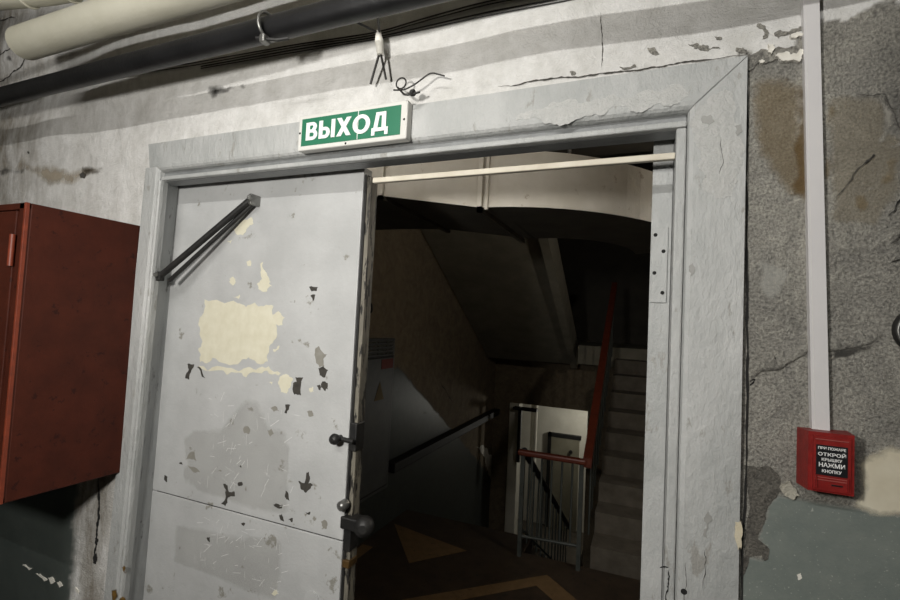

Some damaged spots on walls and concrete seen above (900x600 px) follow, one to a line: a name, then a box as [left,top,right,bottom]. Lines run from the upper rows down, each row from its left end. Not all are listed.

peeling [688,36,722,51]
peeling [736,23,803,71]
crack [859,93,900,128]
water stain [794,113,805,193]
crack [837,154,875,196]
peeling [734,465,800,575]